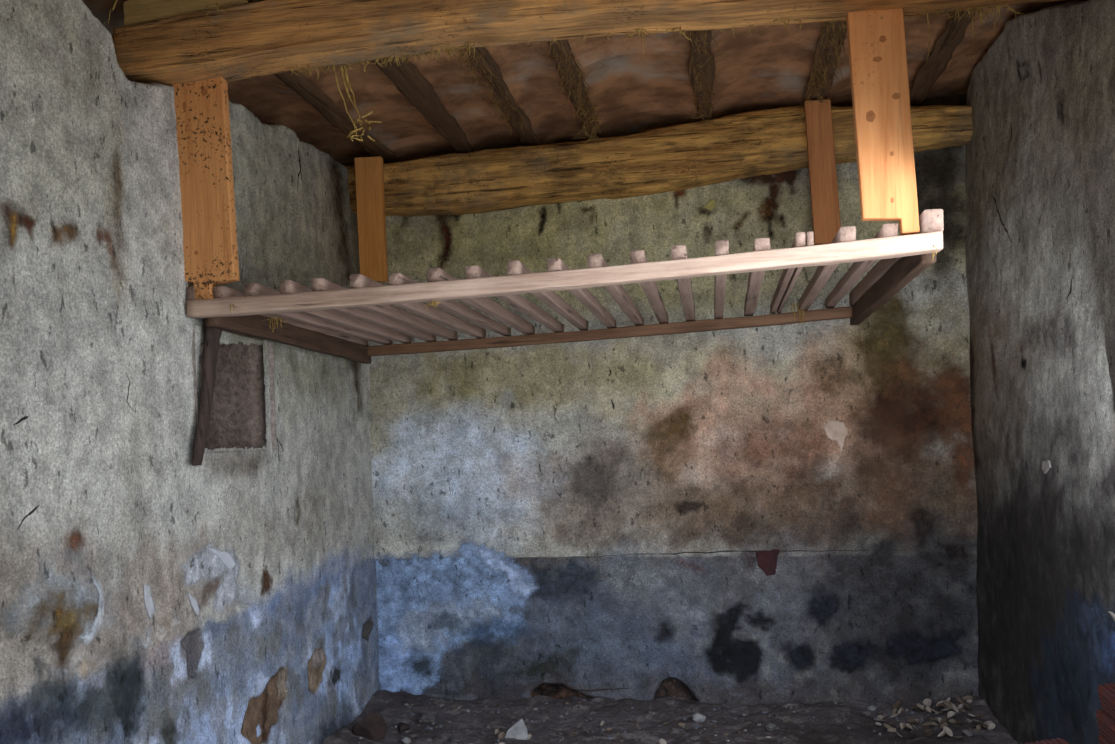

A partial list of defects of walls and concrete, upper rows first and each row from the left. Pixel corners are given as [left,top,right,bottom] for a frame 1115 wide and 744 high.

rust [3,206,35,245]
rust [53,224,78,243]
rust [97,231,113,256]
flaking render [823,420,848,452]
flaking render [29,546,250,682]
water stain [611,559,773,682]
water stain [330,667,341,684]
water stain [787,645,816,670]
water stain [831,631,963,673]
water stain [0,661,146,744]
flaking render [241,667,287,744]
water stain [164,727,180,744]